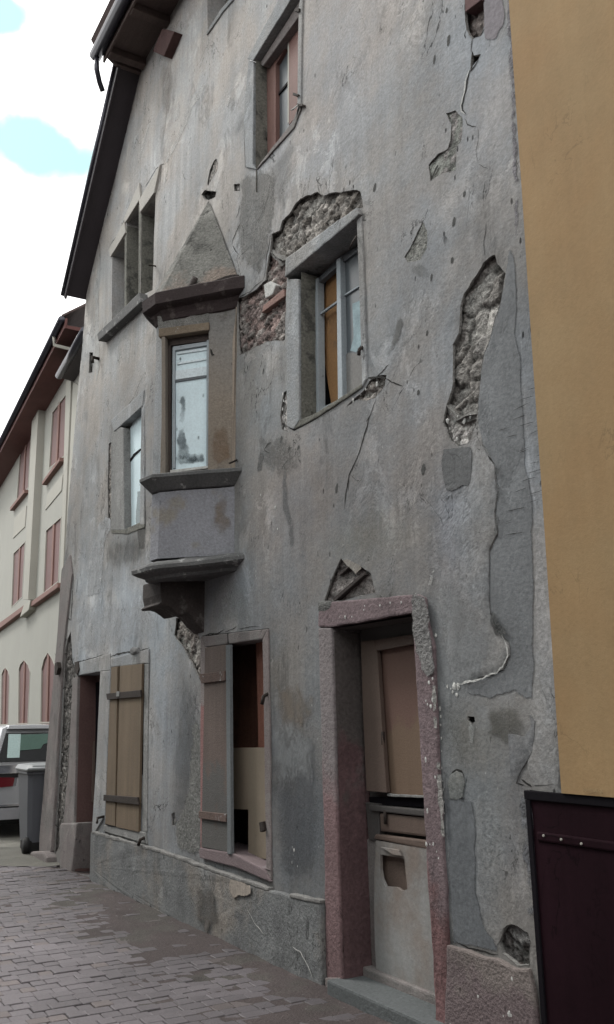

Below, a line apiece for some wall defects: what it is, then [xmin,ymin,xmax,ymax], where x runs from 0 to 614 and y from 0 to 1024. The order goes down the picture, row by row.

spalling [429,110,463,181]
crack [460,30,486,191]
spalling [234,165,376,355]
spalling [404,222,427,262]
crack [344,364,402,508]
spalling [174,618,201,682]
spalling [324,558,375,619]
peeling [379,255,510,859]
peeling [473,791,531,981]